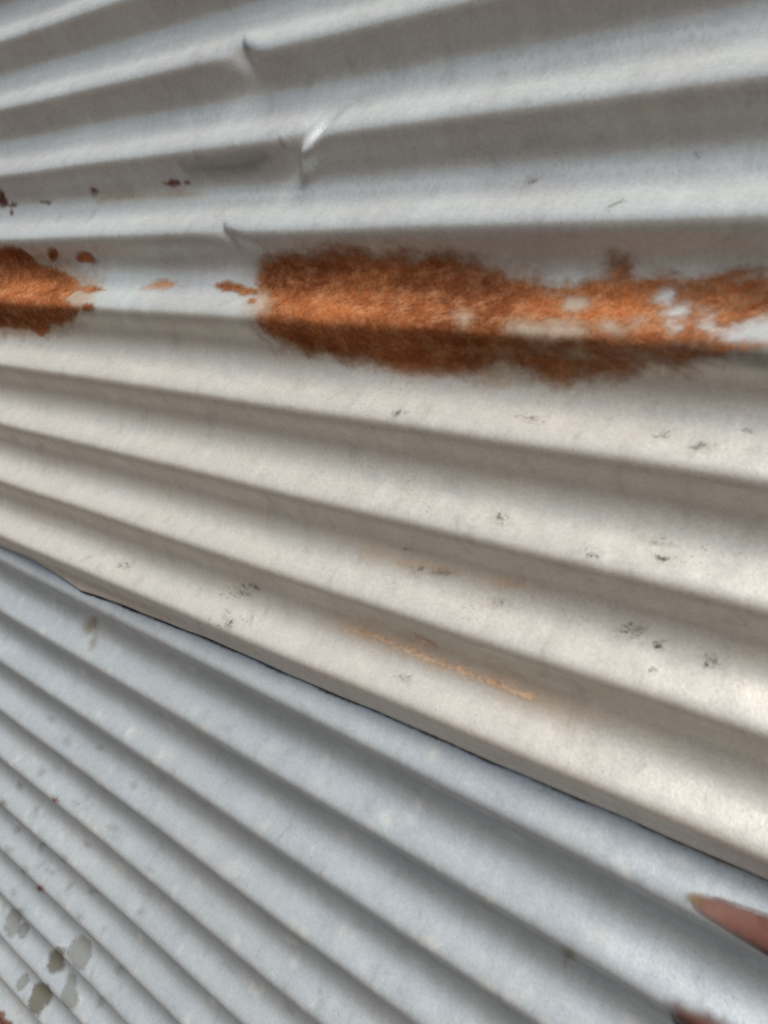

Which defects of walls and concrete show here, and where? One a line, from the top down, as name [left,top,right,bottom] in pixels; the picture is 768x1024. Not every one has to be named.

corrosion [0,247,101,336]
corrosion [216,248,768,385]